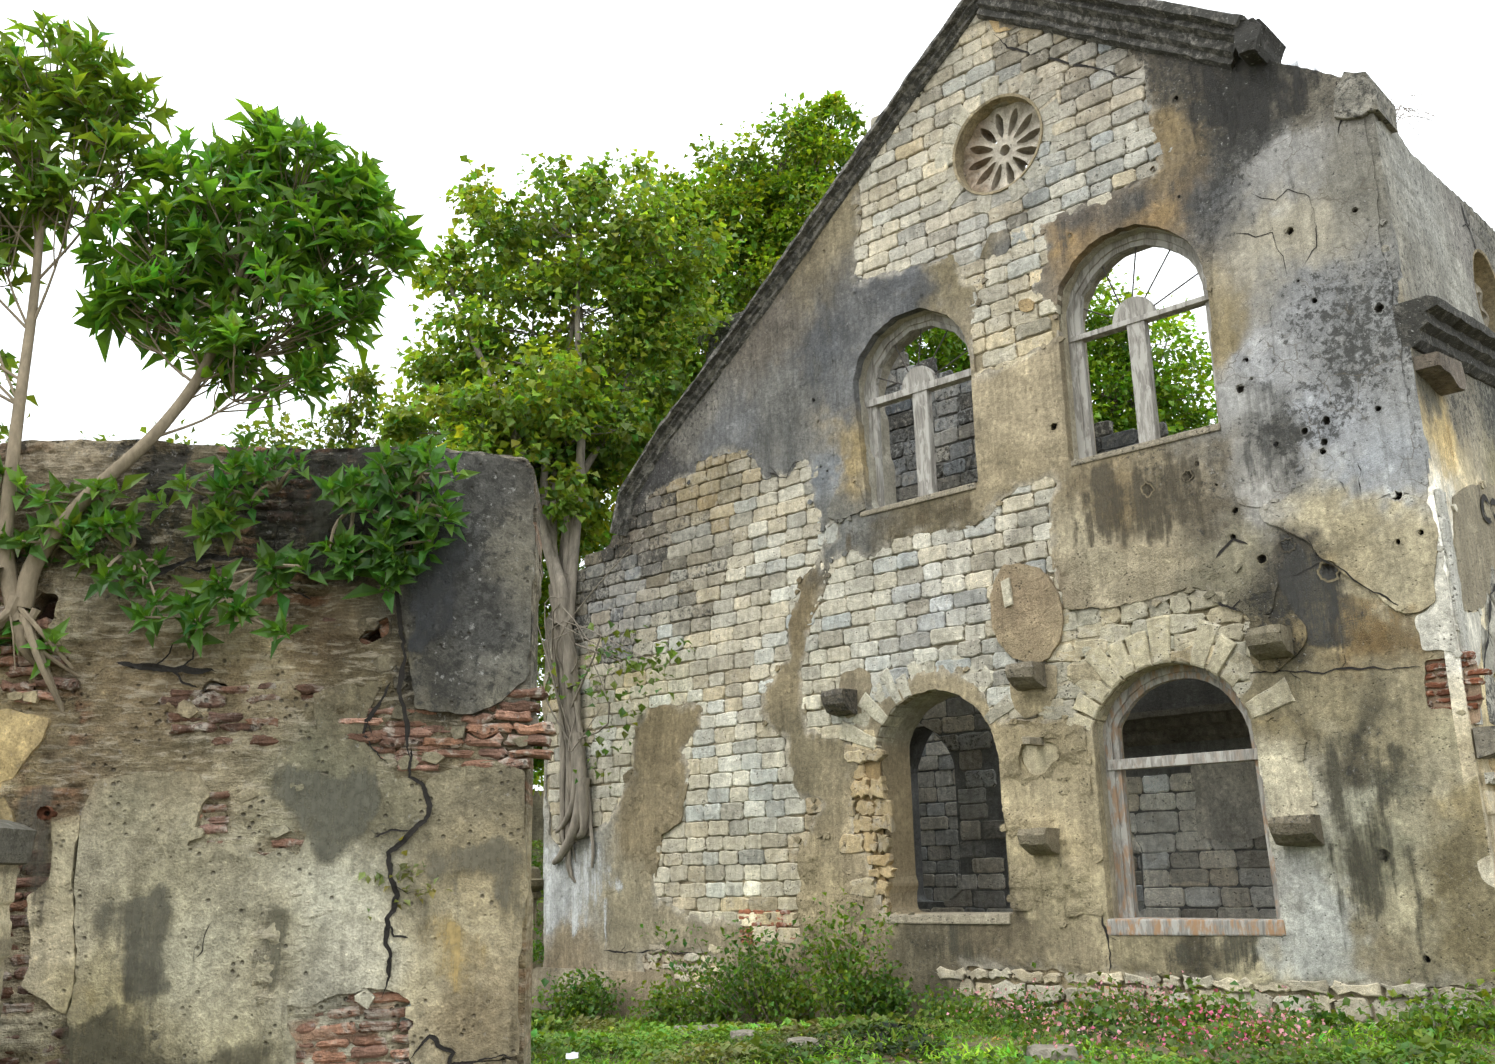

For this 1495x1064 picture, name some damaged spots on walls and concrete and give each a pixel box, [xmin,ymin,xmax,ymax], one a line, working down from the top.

damp [1189,60,1319,146]
spalling [853,14,1172,377]
peeling [1206,117,1495,724]
damp [1074,451,1201,548]
crack [1279,535,1411,612]
spalling [338,449,1307,953]
crack [362,537,433,998]
peeling [1252,714,1318,817]
spalling [1,852,51,1015]
spalling [642,944,722,1002]
spalling [295,988,427,1064]
crack [409,1034,518,1064]